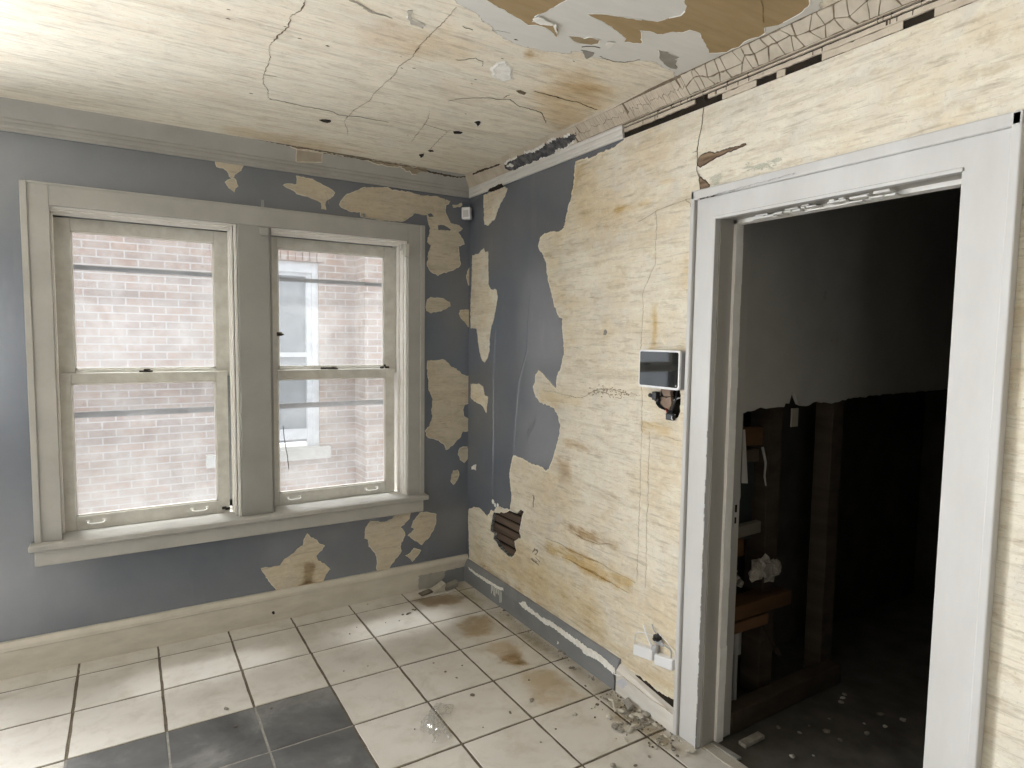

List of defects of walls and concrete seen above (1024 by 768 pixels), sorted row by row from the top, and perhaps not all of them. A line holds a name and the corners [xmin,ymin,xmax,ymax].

peeling [215,162,243,192]
peeling [283,176,498,362]
crack [238,0,979,348]
peeling [261,534,330,590]
peeling [364,512,437,571]
peeling [425,359,488,485]
crack [547,387,680,593]
peeling [456,0,1024,768]